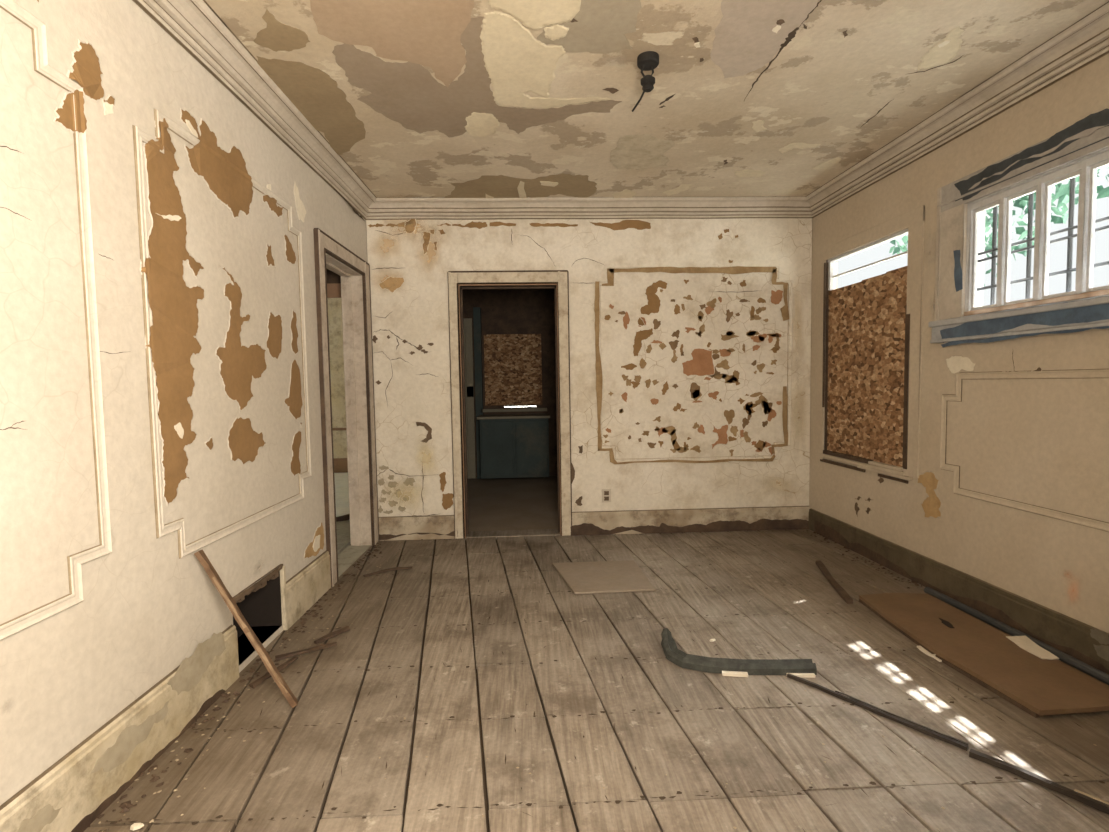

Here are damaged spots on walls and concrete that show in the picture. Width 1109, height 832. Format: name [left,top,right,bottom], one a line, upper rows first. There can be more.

peeling [53,39,116,133]
crack [744,0,822,100]
peeling [368,219,516,255]
peeling [530,220,651,230]
peeling [139,108,306,507]
peeling [594,259,789,464]
peeling [917,471,942,519]